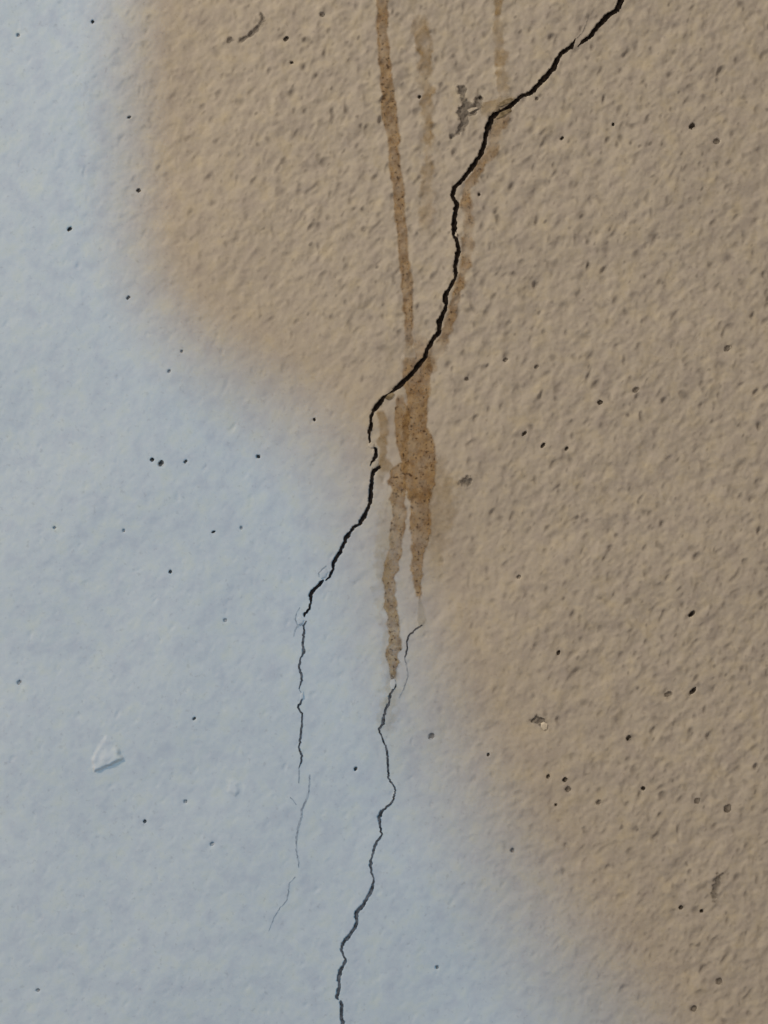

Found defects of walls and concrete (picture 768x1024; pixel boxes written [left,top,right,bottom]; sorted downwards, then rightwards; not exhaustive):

corrosion [377,1,413,329]
corrosion [378,363,436,678]
crack [269,0,624,930]
crack [335,625,422,1024]